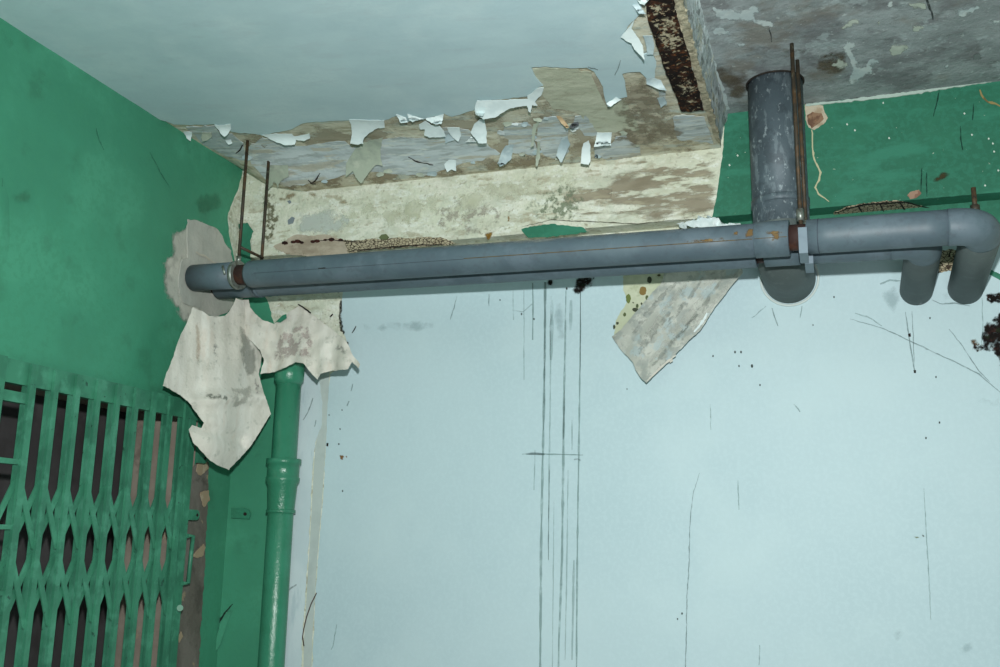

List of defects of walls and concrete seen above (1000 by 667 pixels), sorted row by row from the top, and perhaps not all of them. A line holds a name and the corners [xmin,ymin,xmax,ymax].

peeling [184,0,721,190]
peeling [228,173,243,261]
water stain [300,161,714,234]
water stain [487,157,547,170]
peeling [266,295,347,342]
peeling [613,273,664,335]